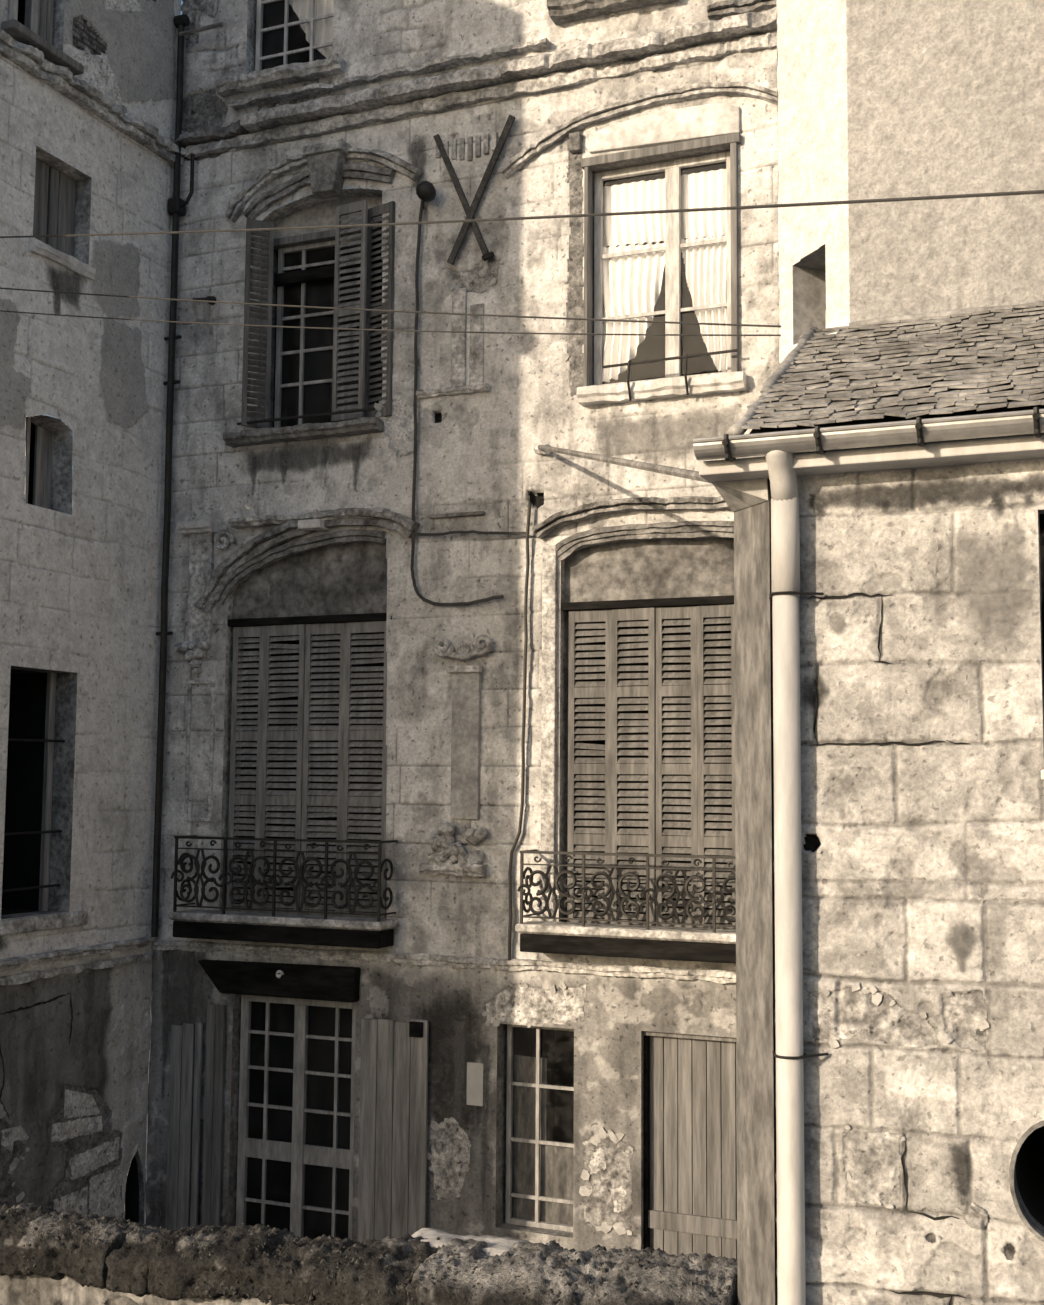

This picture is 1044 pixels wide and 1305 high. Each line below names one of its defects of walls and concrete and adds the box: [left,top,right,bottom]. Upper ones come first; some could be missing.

flaking render [104,0,158,14]
flaking render [72,15,127,113]
damp [992,495,1003,512]
damp [947,923,973,970]
peeling [0,1104,30,1202]
flaking render [48,1085,123,1217]
flaking render [427,1117,471,1200]
flaking render [579,1127,634,1236]